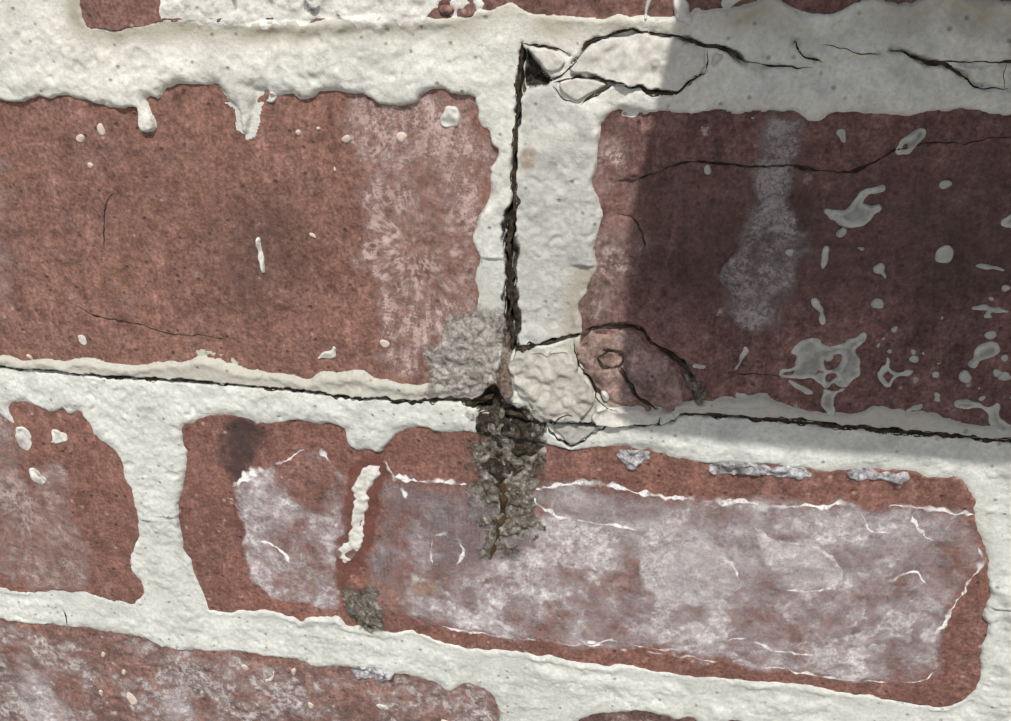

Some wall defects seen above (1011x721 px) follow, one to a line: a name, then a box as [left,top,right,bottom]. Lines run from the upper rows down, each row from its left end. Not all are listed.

peeling [159,0,484,31]
crack [0,27,1011,446]
spalling [423,306,686,444]
efflorescence [229,450,338,608]
efflorescence [309,513,346,563]
efflorescence [372,463,984,683]